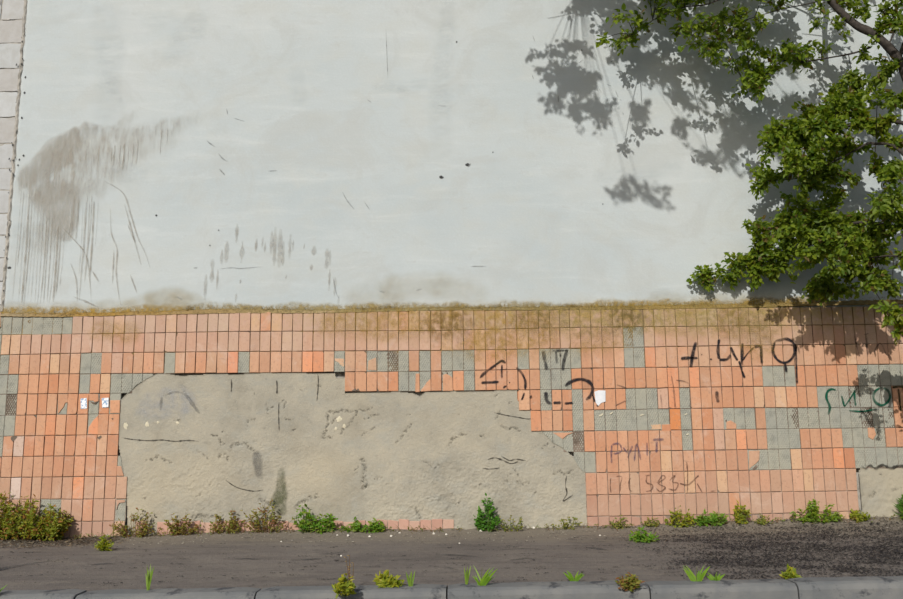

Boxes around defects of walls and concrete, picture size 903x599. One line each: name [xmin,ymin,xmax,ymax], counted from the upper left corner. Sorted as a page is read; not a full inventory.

peeling [0,317,73,457]
spalling [79,349,596,535]
peeling [594,388,669,431]
peeling [623,327,645,368]
peeling [679,388,693,450]
peeling [723,364,903,517]